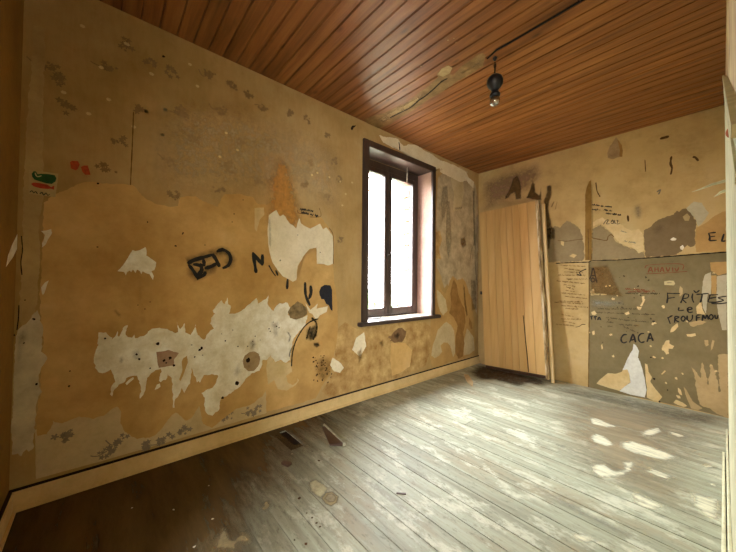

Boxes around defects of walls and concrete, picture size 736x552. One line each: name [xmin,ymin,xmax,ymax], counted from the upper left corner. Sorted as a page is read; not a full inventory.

peeling [365,53,485,187]
peeling [11,163,431,456]
water stain [430,167,478,367]
peeling [543,202,729,418]